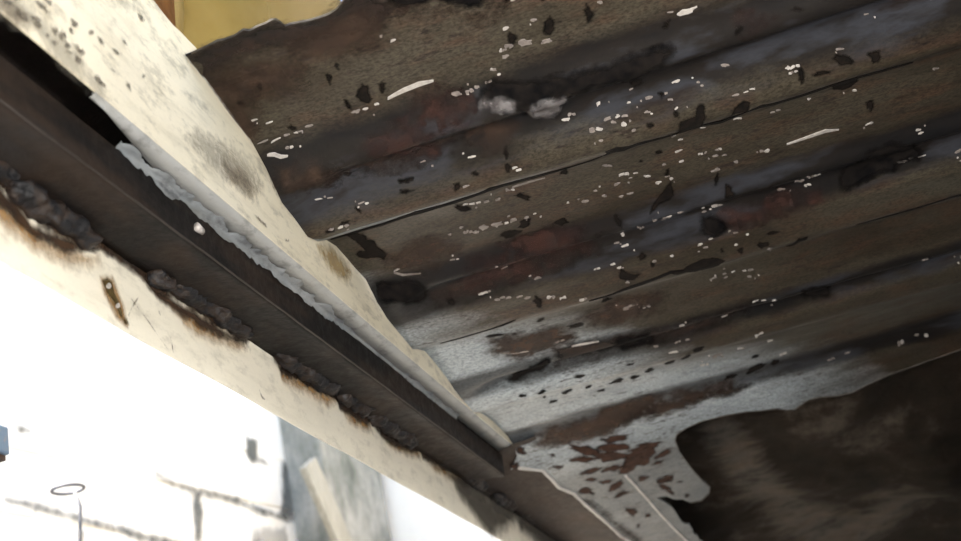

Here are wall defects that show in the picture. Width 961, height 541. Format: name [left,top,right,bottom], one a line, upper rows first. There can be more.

peeling [499,17,555,59]
peeling [662,6,697,29]
spalling [0,0,134,151]
peeling [343,79,434,116]
peeling [258,124,313,159]
peeling [589,79,706,163]
peeling [787,129,839,145]
peeling [567,150,683,230]
rust [102,279,129,325]
rust [489,293,749,383]
peeling [519,363,654,403]
peeling [549,434,690,498]